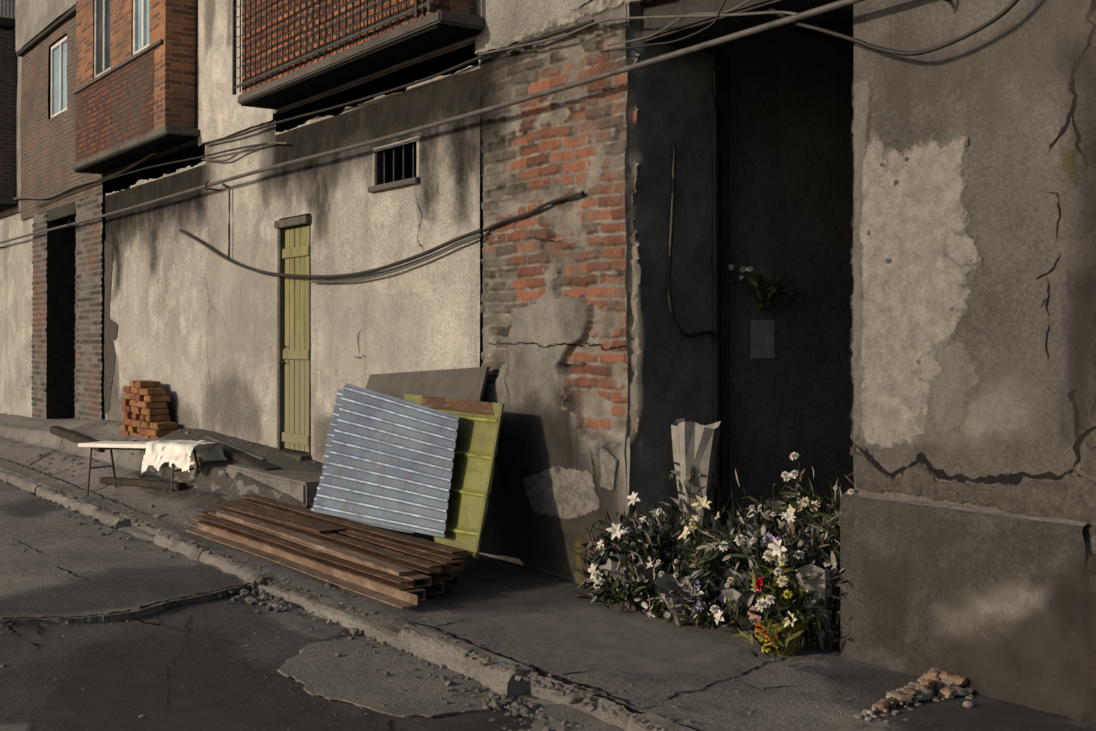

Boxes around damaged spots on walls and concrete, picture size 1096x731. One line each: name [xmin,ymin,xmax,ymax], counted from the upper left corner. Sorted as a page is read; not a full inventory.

spalling [500,0,632,47]
crack [1047,0,1096,168]
flaking render [850,81,1096,573]
crack [1035,192,1065,363]
crack [853,374,1096,485]
crack [0,583,252,652]
crack [426,710,476,718]
crack [405,619,800,714]